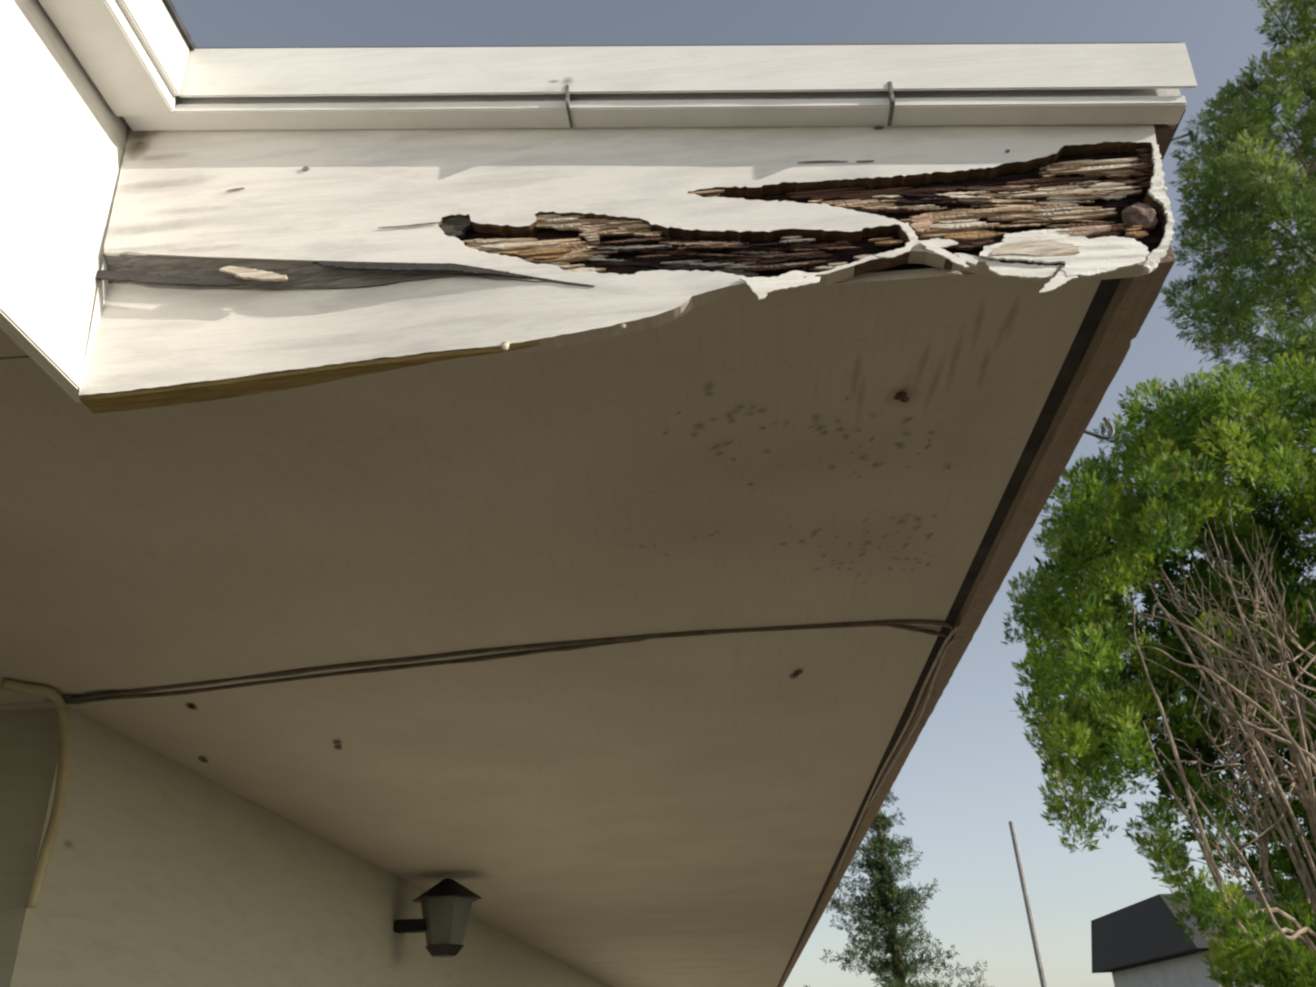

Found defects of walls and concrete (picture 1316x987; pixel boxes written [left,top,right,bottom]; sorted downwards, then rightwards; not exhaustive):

spalling [439,144,1174,300]